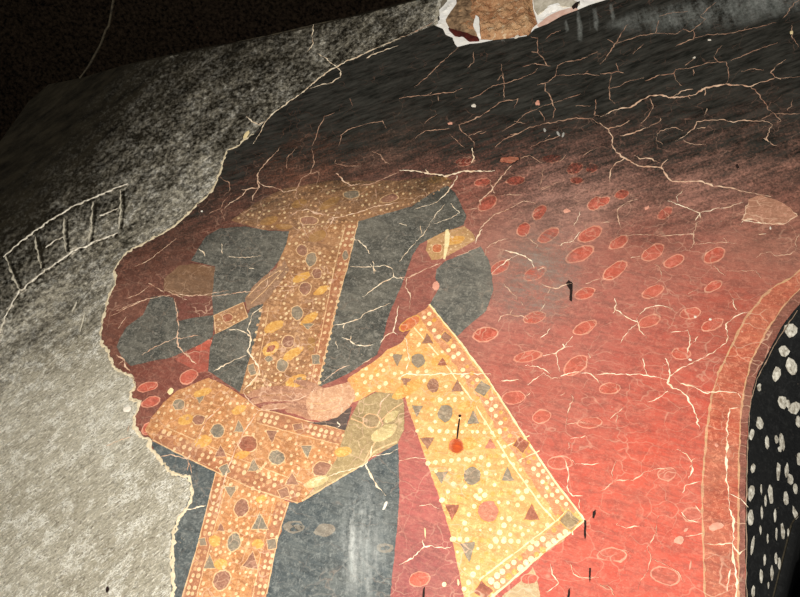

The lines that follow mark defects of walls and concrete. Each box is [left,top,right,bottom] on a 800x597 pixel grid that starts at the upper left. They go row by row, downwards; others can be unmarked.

flaking render [0,0,604,597]
crack [116,0,799,514]
peeling [742,195,798,229]
crack [402,539,450,564]
crack [503,300,748,597]